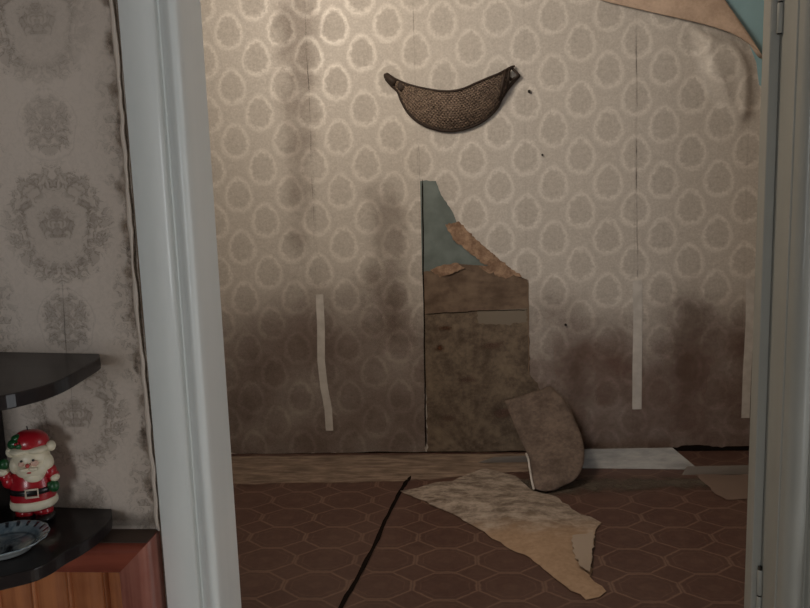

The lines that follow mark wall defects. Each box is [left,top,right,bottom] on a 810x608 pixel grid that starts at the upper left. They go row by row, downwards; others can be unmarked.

peeling [445,221,522,279]
water stain [535,329,752,449]